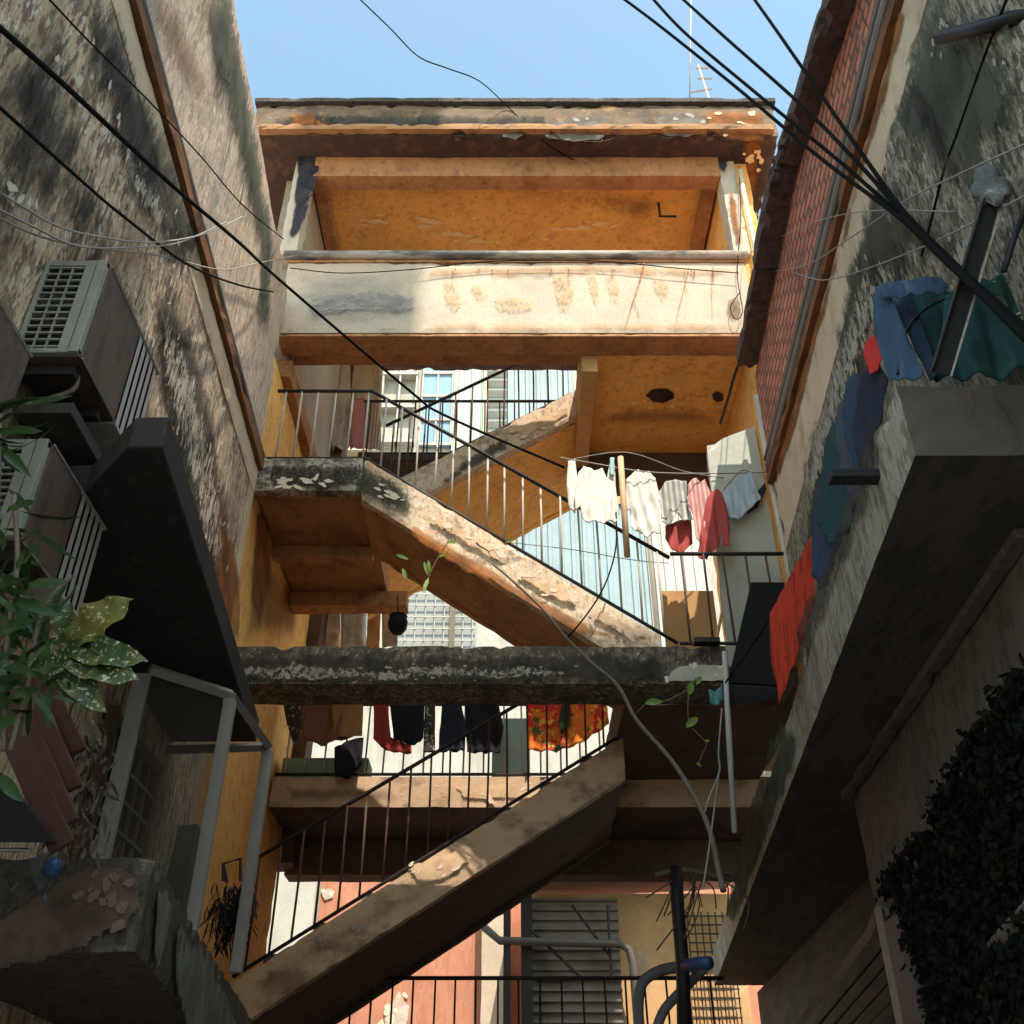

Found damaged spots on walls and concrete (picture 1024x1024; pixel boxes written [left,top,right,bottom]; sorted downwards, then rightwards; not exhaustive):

water stain [0,1,203,274]
water stain [201,0,273,334]
water stain [290,157,319,236]
crack [625,263,645,326]
crack [675,266,713,328]
water stain [149,269,228,564]
peeling [275,465,409,510]
peeling [430,515,507,560]
peeling [516,566,578,602]
peeling [244,661,579,683]
peeling [664,662,723,683]
peeling [0,864,142,969]